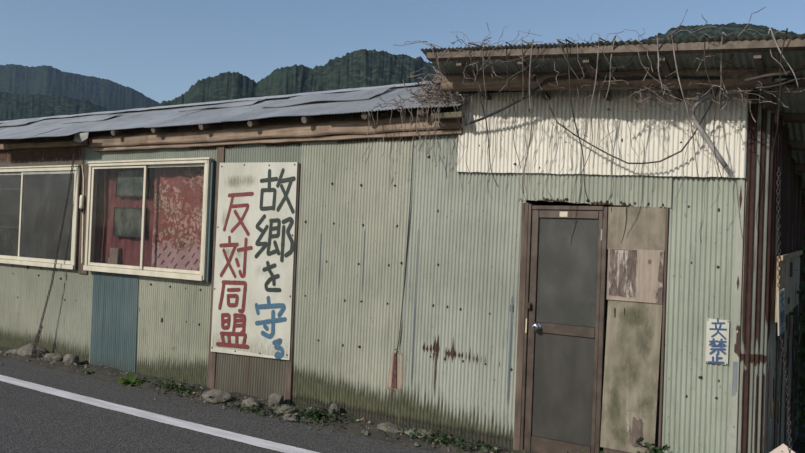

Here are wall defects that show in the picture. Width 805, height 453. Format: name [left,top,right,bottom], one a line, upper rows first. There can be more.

peeling [608,249,637,298]
peeling [648,252,663,303]
rust [734,104,805,453]
rust [423,335,478,390]
damp [291,396,513,449]